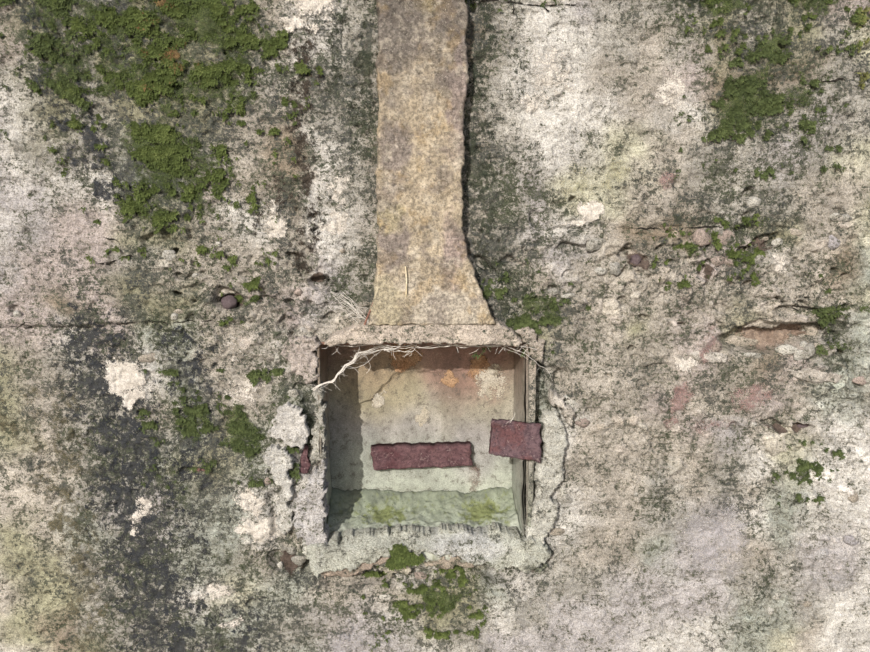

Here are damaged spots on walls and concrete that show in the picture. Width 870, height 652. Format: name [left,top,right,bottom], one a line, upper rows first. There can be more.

crack [1,320,213,329]
peeling [742,316,811,328]
spalling [222,376,265,409]
peeling [234,318,545,555]
leakage [0,290,283,652]
peeling [523,387,575,573]
peeling [321,556,411,579]
peeling [424,555,482,570]